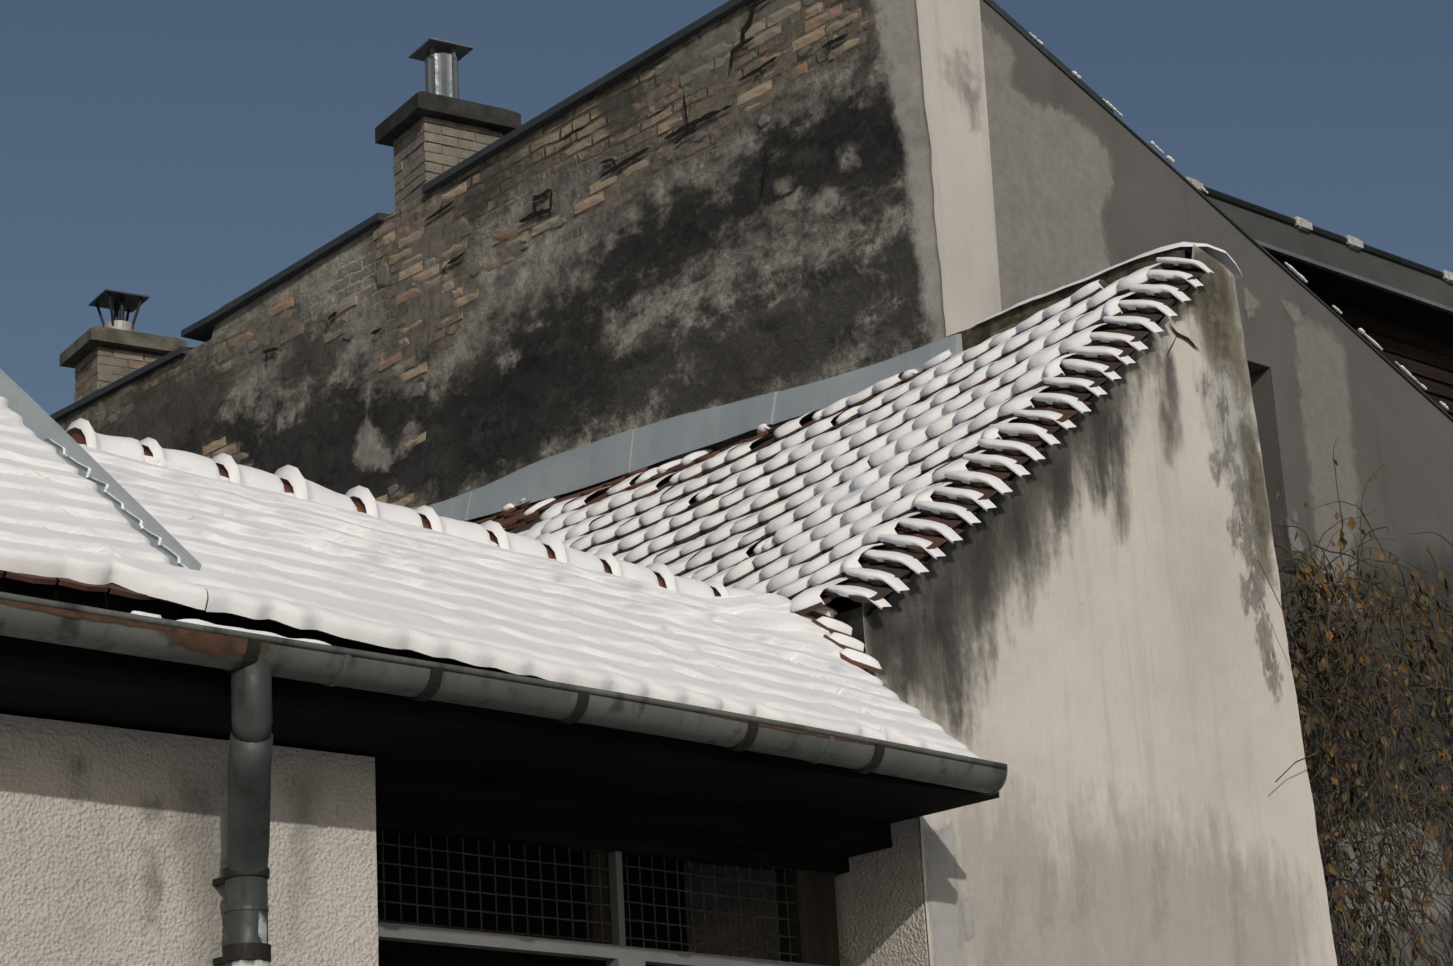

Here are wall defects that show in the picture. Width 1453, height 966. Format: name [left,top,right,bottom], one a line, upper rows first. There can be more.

spalling [373,0,878,399]
water stain [736,98,903,212]
spalling [324,296,357,344]
water stain [335,390,385,441]
spalling [395,420,426,456]
water stain [452,296,601,470]
spalling [375,484,427,509]
water stain [863,333,1177,724]